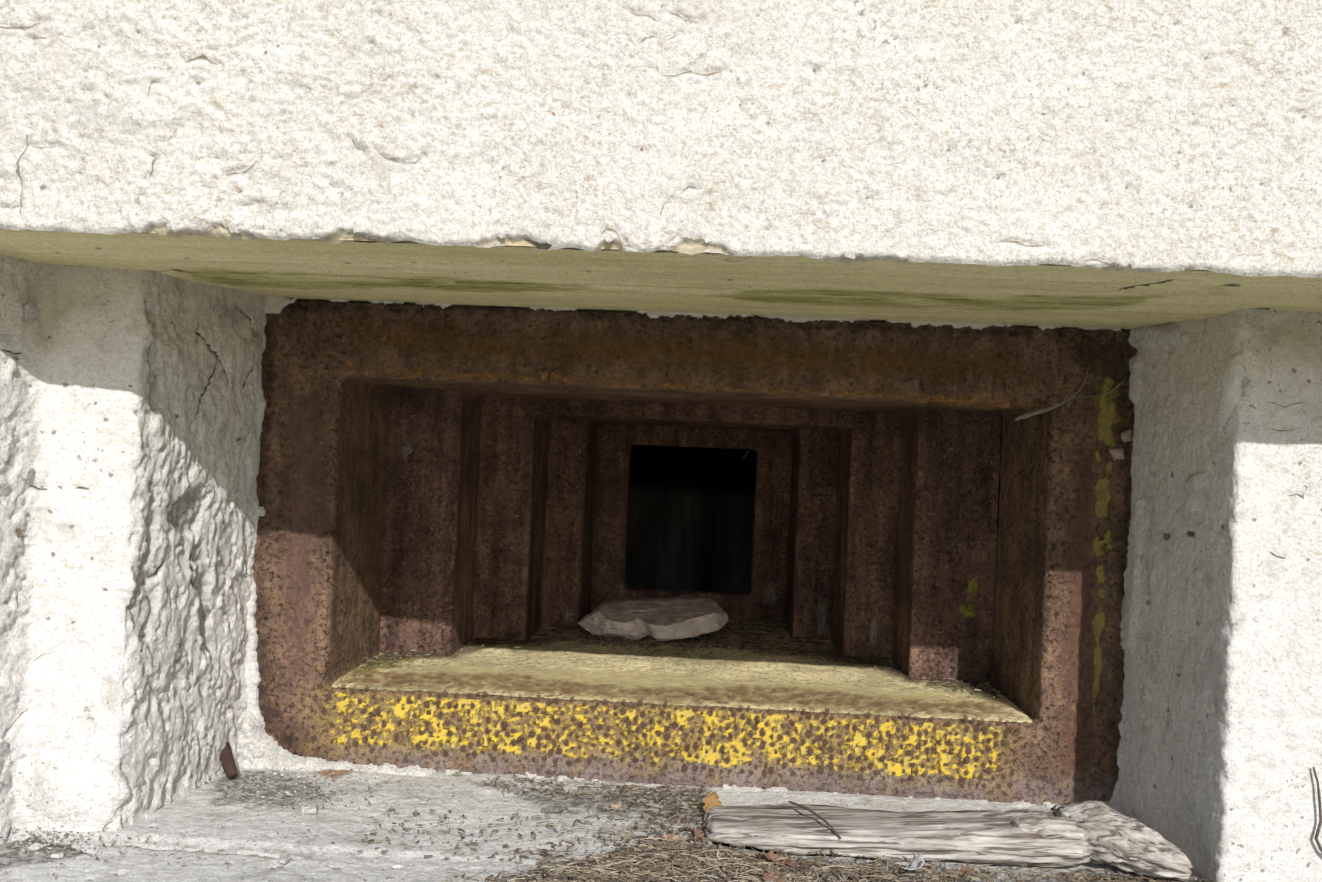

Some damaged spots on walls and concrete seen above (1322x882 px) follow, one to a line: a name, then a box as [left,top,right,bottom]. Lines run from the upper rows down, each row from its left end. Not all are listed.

crack [5,131,46,218]
damp [172,269,547,292]
rust [386,303,519,314]
damp [720,291,1143,311]
rust [976,329,1135,468]
rust [256,631,278,722]
rust [338,670,1017,719]